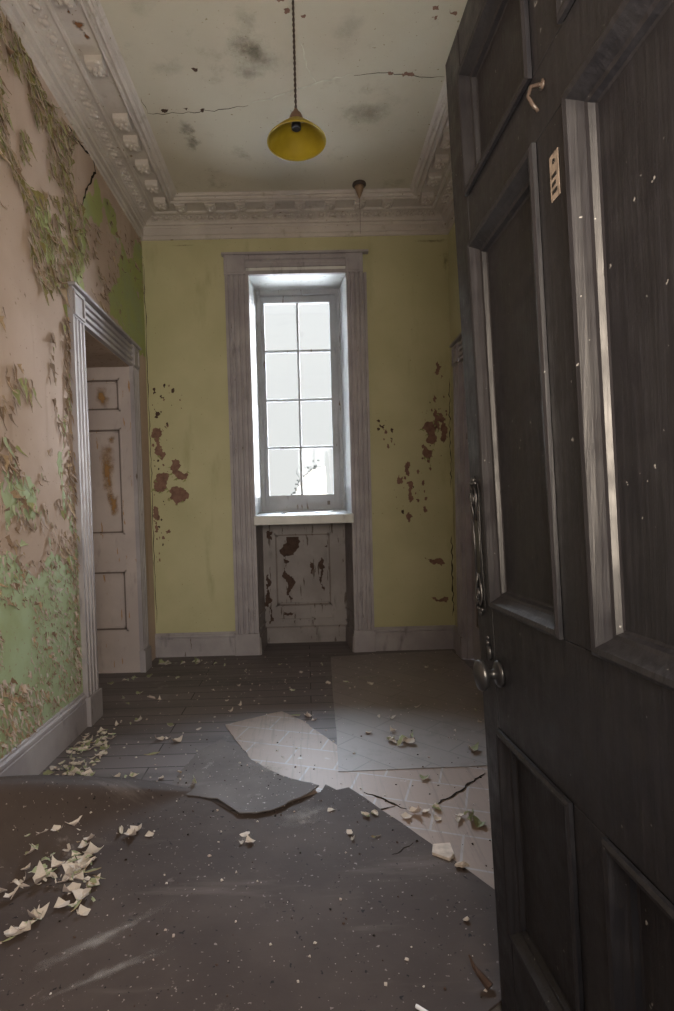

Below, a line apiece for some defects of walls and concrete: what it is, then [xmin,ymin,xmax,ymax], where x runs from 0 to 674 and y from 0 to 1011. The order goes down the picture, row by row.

crack [141,35,434,115]
peeling [0,6,146,758]
peeling [151,384,191,561]
peeling [396,396,448,522]
peeling [279,534,300,600]
peeling [310,558,325,590]
peeling [43,727,116,776]